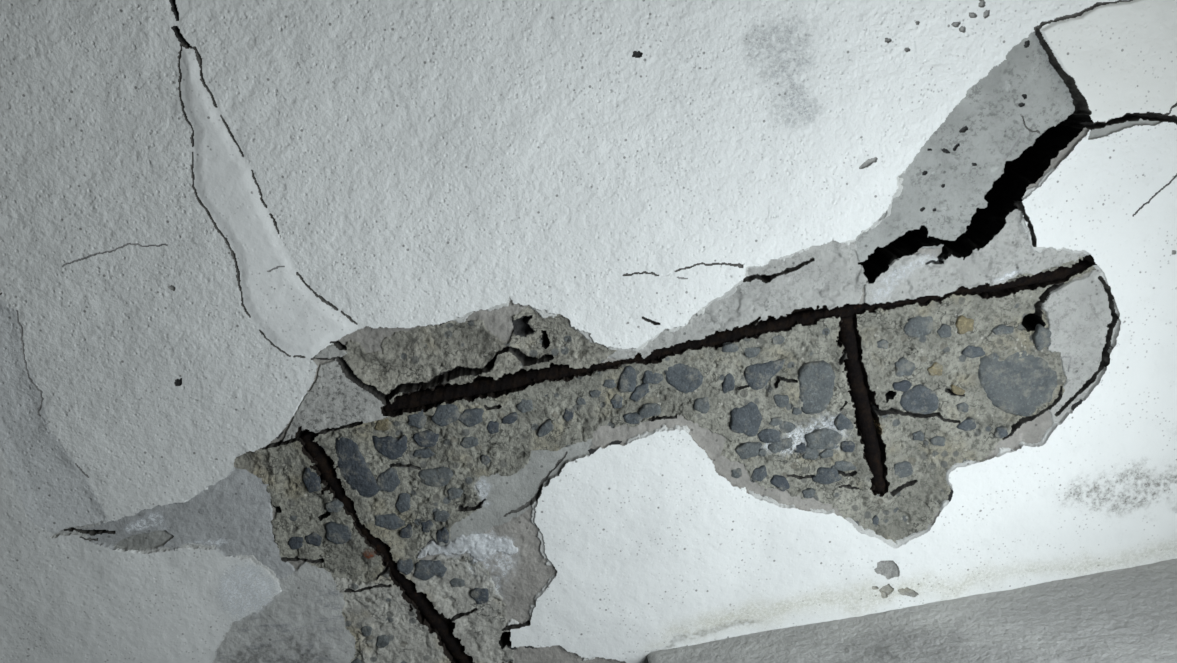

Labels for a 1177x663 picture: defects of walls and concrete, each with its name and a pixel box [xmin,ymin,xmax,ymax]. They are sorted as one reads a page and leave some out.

peeling [951,0,990,33]
crack [1003,0,1177,161]
crack [169,0,554,450]
peeling [336,32,1075,394]
crack [1013,200,1037,247]
spalling [1022,118,1163,200]
crack [1132,173,1177,217]
crack [623,257,815,283]
crack [1002,276,1119,440]
spalling [50,209,1121,663]
crack [870,403,961,424]
crack [503,451,568,517]